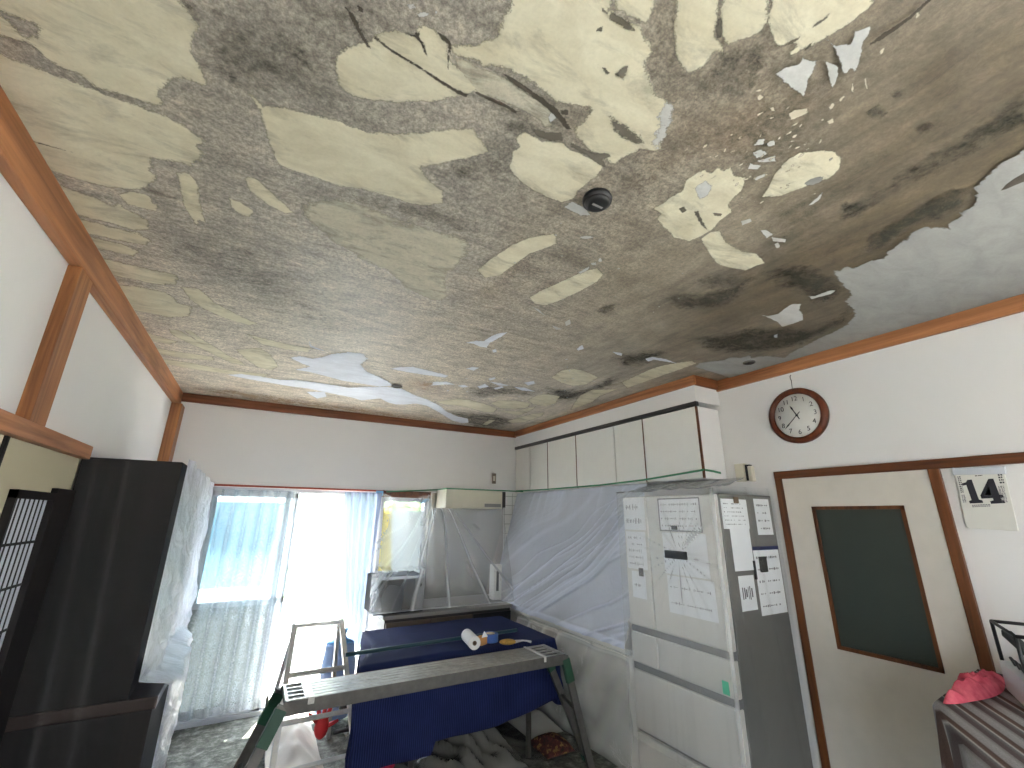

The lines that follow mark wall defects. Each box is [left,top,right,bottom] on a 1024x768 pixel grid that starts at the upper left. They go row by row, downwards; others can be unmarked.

crack [345,6,572,130]
peeling [652,102,674,150]
peeling [703,26,871,198]
leakage [911,102,1024,179]
peeling [565,202,590,216]
leakage [869,189,962,249]
leakage [672,278,740,308]
leakage [776,266,836,301]
peeling [695,150,1024,378]
leakage [703,319,844,352]
peeling [230,342,542,423]
leakage [555,380,612,399]